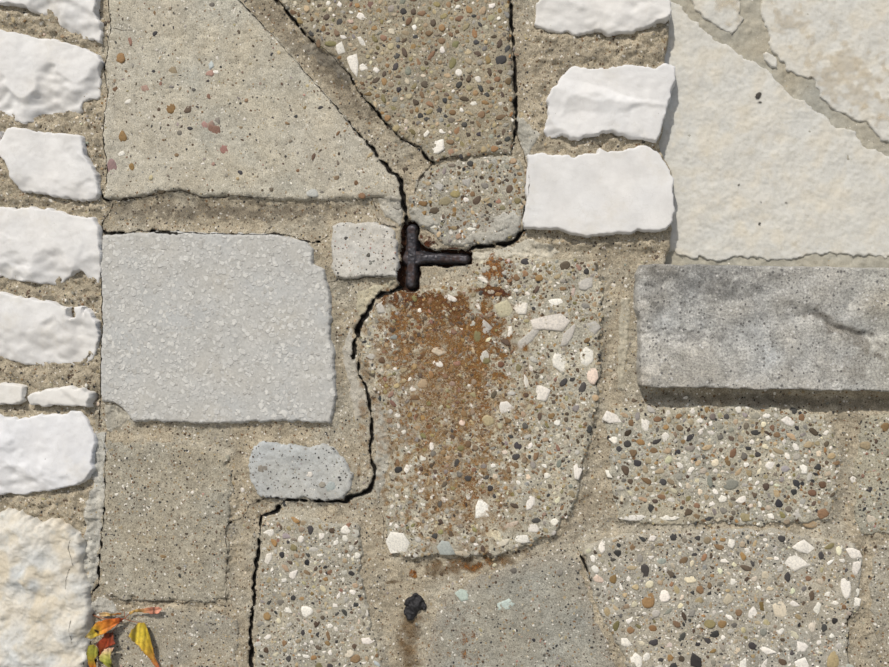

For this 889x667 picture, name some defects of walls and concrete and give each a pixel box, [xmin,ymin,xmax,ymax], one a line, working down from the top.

crack [101,0,328,243]
crack [240,0,455,228]
crack [467,2,530,252]
corrosion [378,253,527,536]